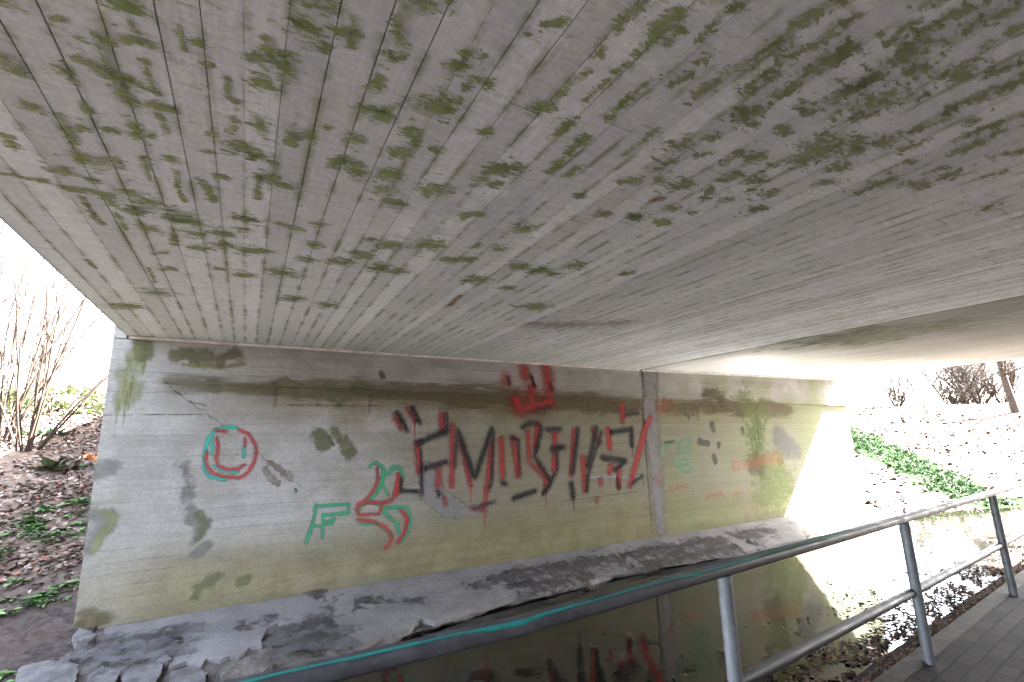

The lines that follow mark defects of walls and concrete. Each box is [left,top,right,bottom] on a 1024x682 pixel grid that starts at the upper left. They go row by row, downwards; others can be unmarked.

damp [87,461,119,479]
damp [180,464,212,558]
spalling [60,621,206,670]
spalling [264,609,363,664]